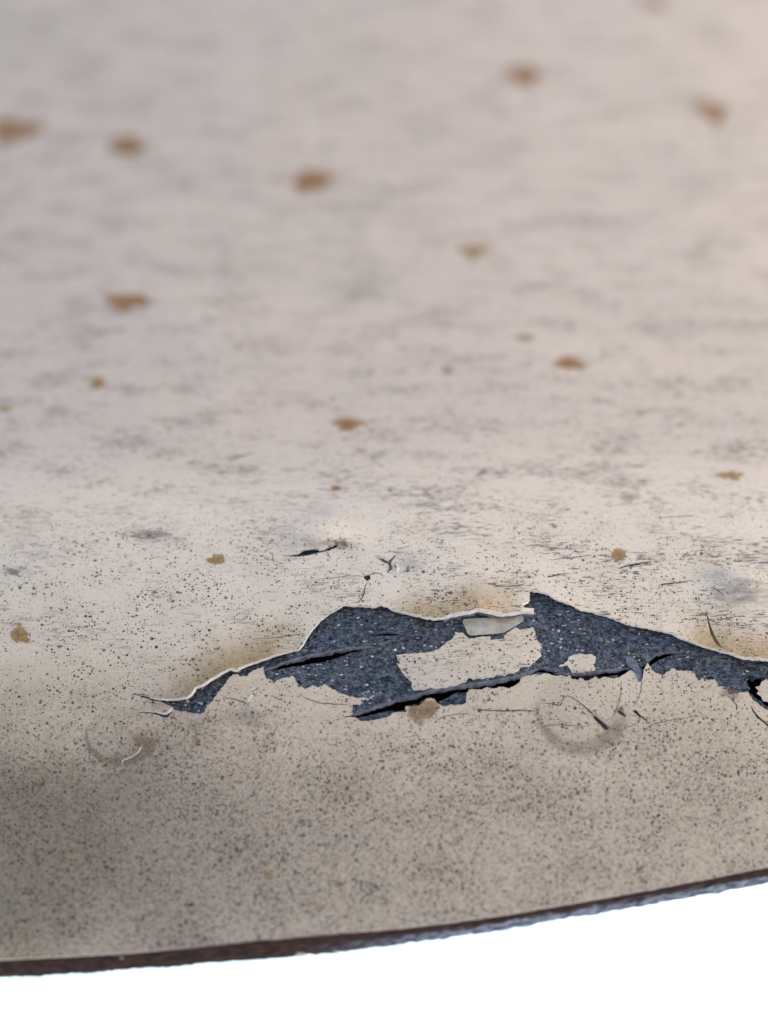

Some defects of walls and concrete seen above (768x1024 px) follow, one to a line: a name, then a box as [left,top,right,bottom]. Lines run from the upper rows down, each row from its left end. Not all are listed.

rust [0,120,42,143]
rust [109,136,143,155]
rust [295,170,334,194]
rust [107,295,147,311]
rust [555,357,581,369]
rust [336,419,361,430]
rust [715,470,743,480]
rust [207,554,224,564]
rust [611,548,627,562]
rust [10,623,29,643]
peeling [137,592,768,721]
rust [410,701,438,724]